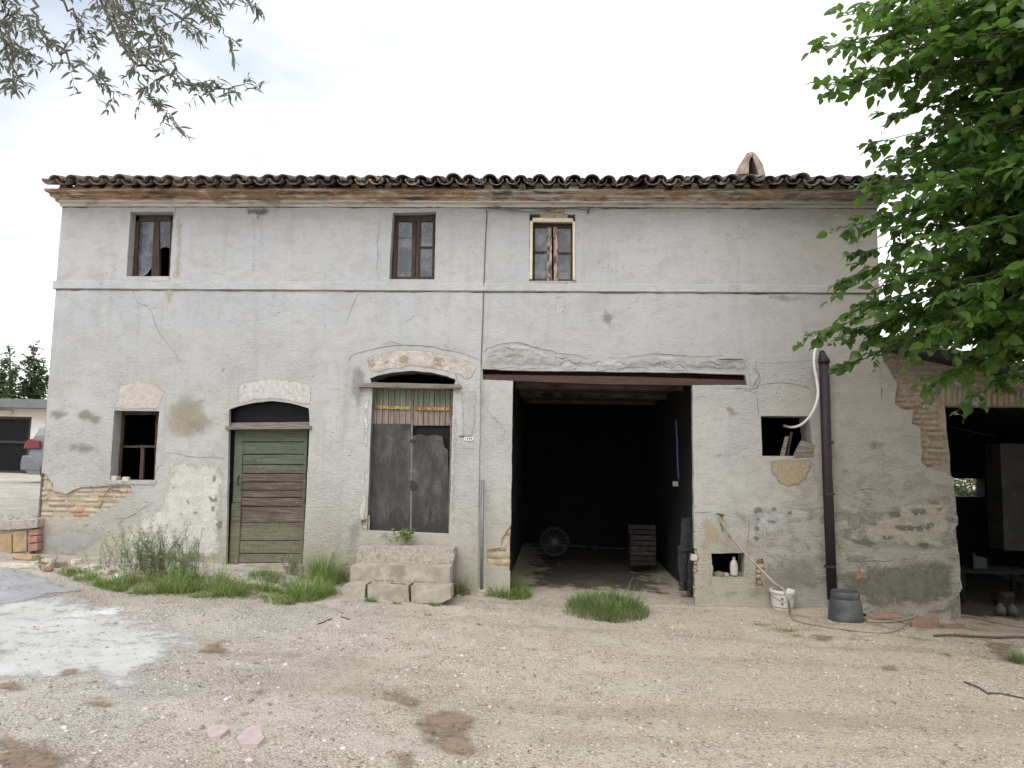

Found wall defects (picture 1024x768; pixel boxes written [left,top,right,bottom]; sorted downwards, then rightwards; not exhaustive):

spalling [771,460,811,486]
spalling [41,474,132,519]
peeling [127,462,222,557]
peeling [853,495,957,549]
spalling [486,526,511,570]